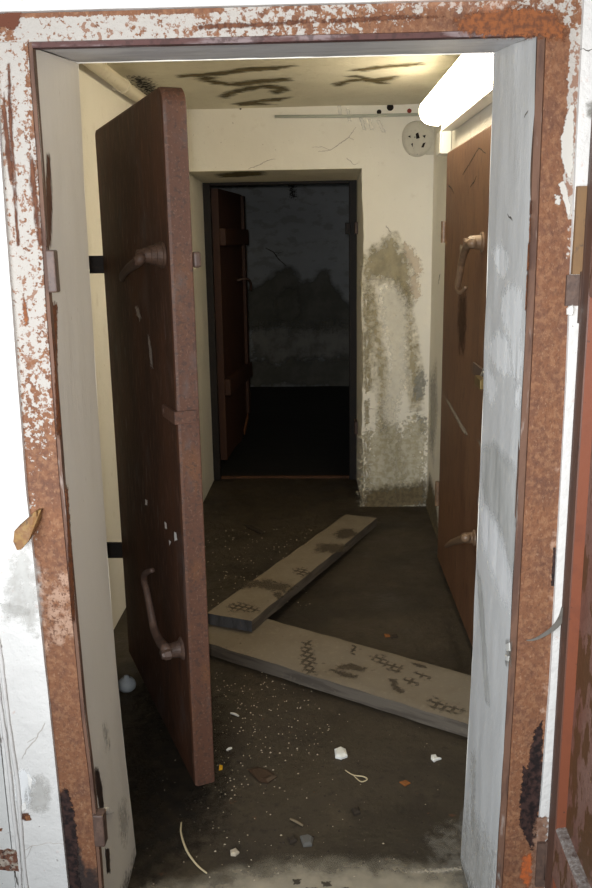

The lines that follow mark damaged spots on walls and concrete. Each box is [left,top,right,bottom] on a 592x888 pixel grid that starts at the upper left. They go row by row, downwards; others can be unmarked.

rust [0,12,21,30]
rust [198,5,567,42]
rust [2,64,19,246]
rust [30,154,53,248]
rust [53,301,61,438]
leakage [359,238,438,539]
rust [65,485,75,622]
rust [520,817,549,888]